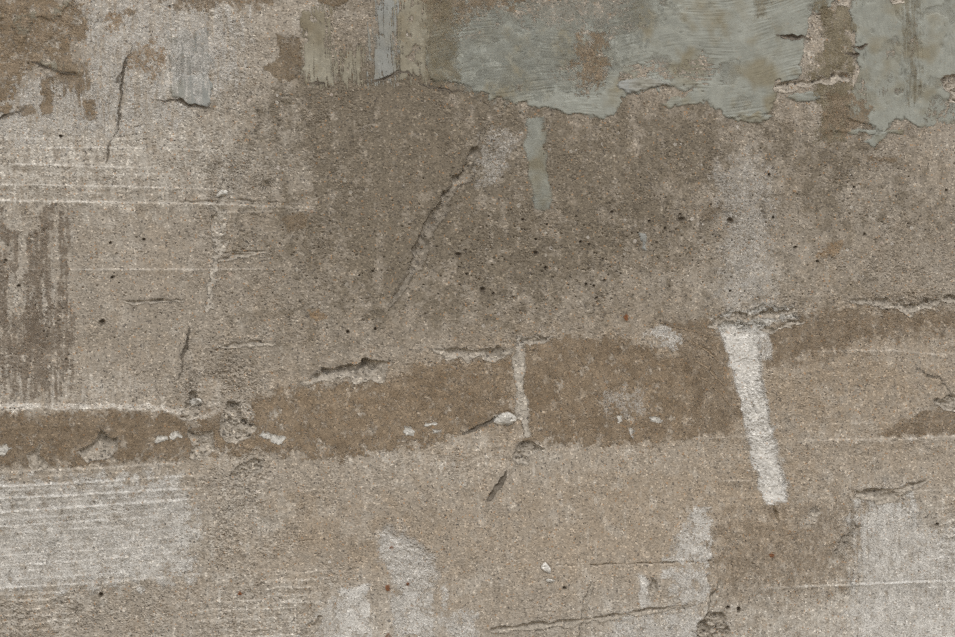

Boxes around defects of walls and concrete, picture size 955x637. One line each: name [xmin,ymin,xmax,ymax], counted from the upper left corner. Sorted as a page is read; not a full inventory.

peeling [300,0,955,147]
crack [106,45,133,163]
crack [850,293,955,317]
spalling [300,358,392,386]
spalling [433,334,552,465]
spalling [706,303,805,505]
spalling [933,394,955,412]
spalling [78,429,118,463]
crack [486,470,507,501]
crack [578,581,594,637]